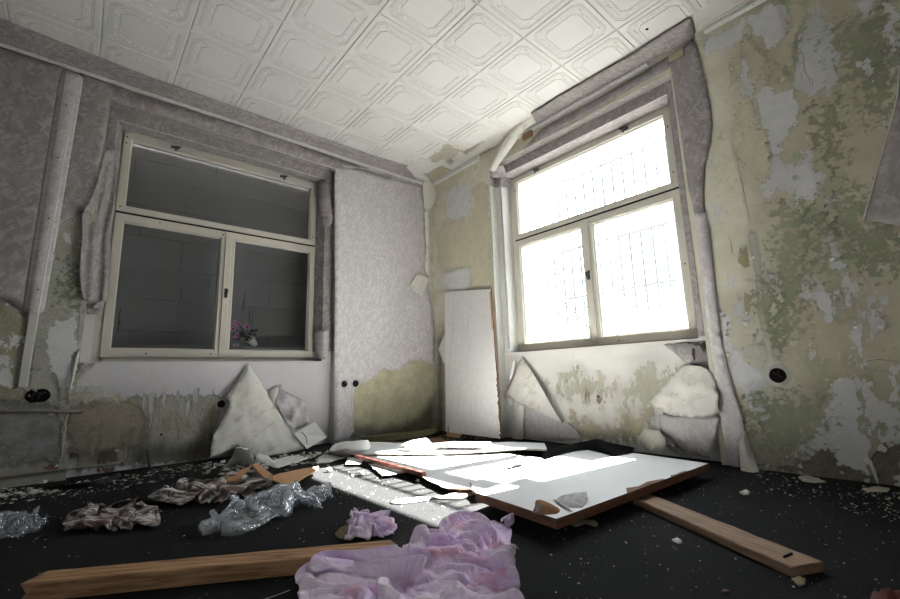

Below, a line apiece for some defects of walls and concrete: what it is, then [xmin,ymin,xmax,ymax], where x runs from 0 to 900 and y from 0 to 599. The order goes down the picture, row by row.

peeling [703,2,844,207]
peeling [855,57,874,82]
peeling [851,0,900,54]
peeling [437,182,491,291]
spalling [737,245,755,268]
peeling [0,332,26,390]
peeling [46,303,99,390]
peeling [717,292,774,422]
peeling [757,232,900,486]
water stain [0,388,211,467]